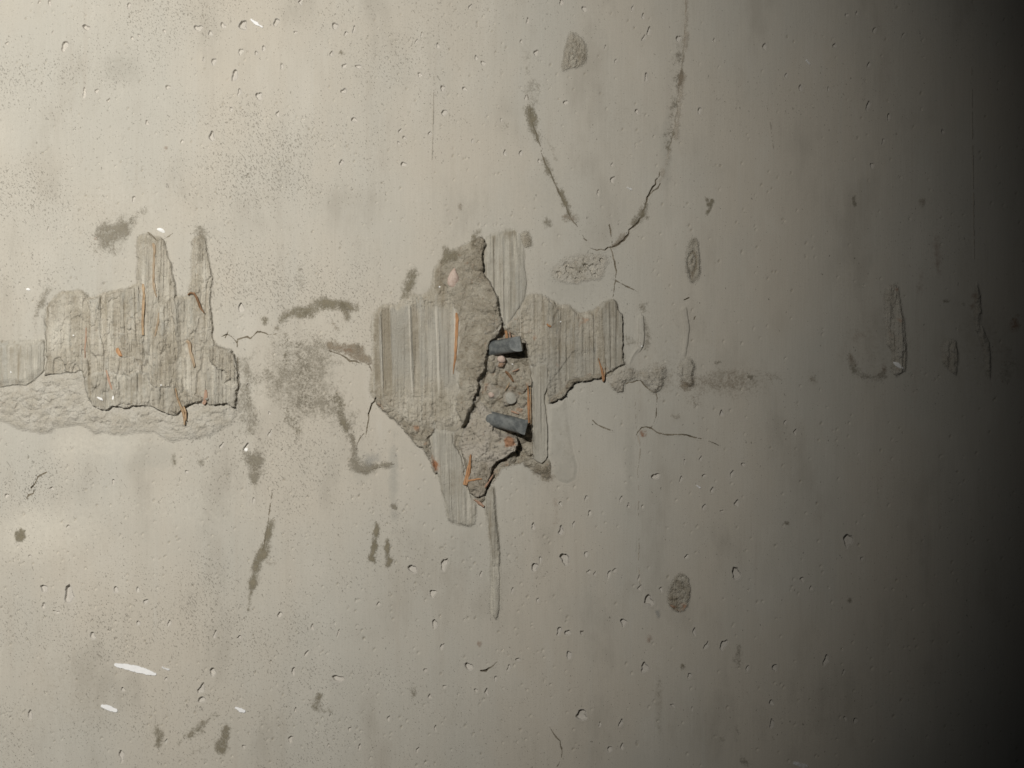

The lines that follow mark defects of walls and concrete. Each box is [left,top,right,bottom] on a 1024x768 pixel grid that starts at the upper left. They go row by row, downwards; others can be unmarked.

crack [527,0,689,297]
spalling [548,252,611,285]
spalling [453,327,534,506]
crack [590,380,721,448]